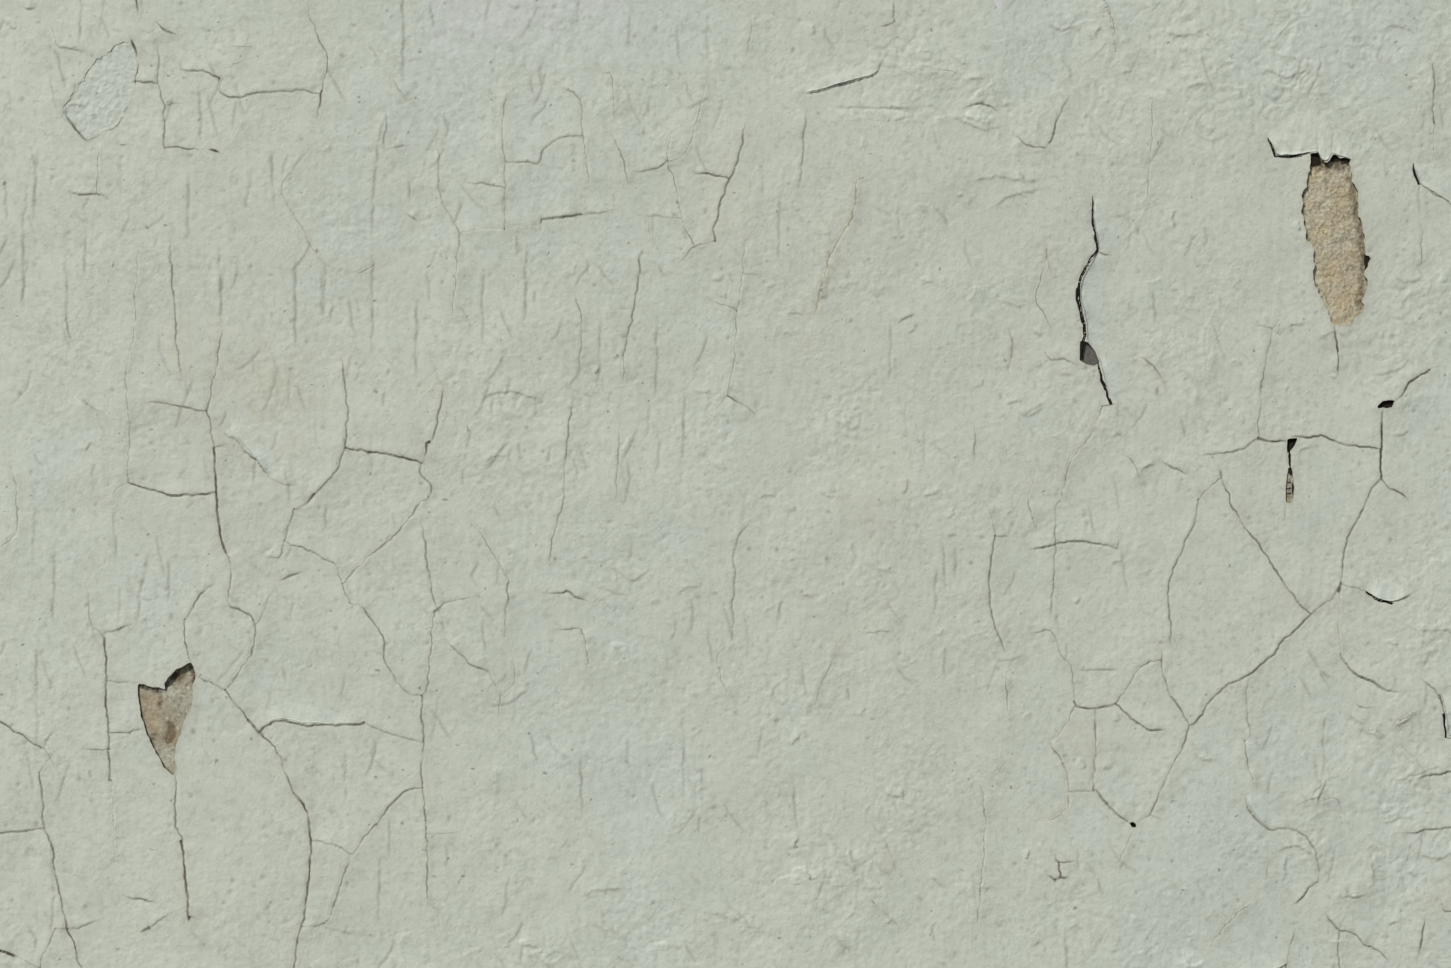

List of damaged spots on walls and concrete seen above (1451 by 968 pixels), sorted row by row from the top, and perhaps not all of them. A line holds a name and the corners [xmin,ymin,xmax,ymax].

peeling [1268,106,1371,326]
crack [1076,196,1112,405]
crack [133,447,226,553]
crack [1272,424,1394,490]
crack [1338,583,1393,605]
peeling [138,663,196,775]
crack [1440,701,1448,738]
crack [180,840,191,918]
crack [300,800,311,921]